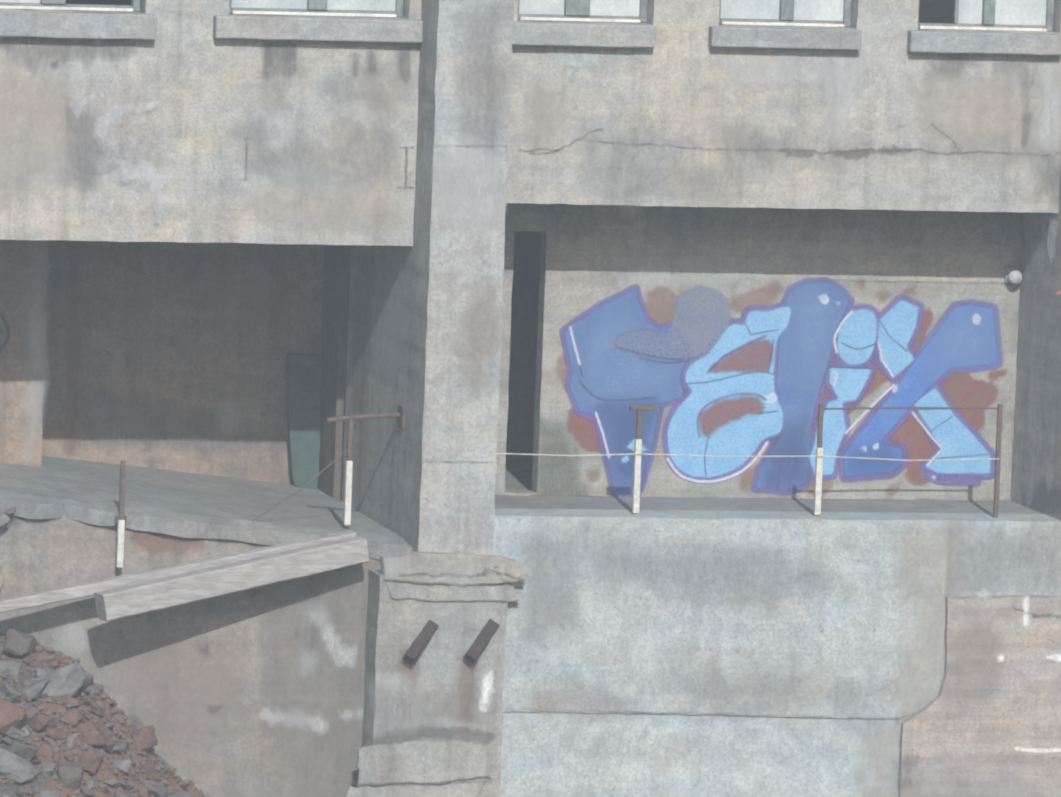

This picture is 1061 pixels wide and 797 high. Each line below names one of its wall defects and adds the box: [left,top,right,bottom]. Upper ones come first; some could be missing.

spalling [345,727,492,797]